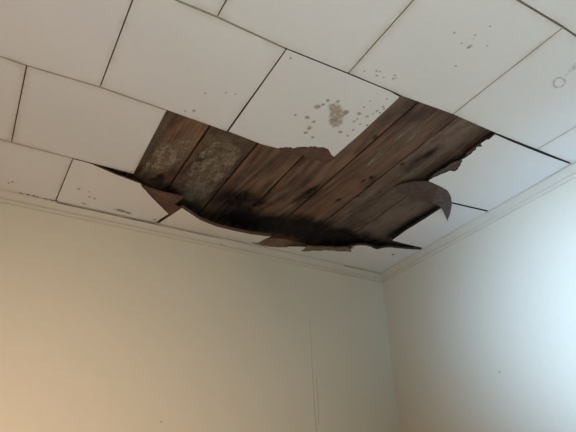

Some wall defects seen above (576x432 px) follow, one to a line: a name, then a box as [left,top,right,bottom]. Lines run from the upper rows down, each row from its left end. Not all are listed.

damp [315,100,348,127]
damp [144,138,240,202]
damp [222,191,385,246]
damp [389,209,435,237]